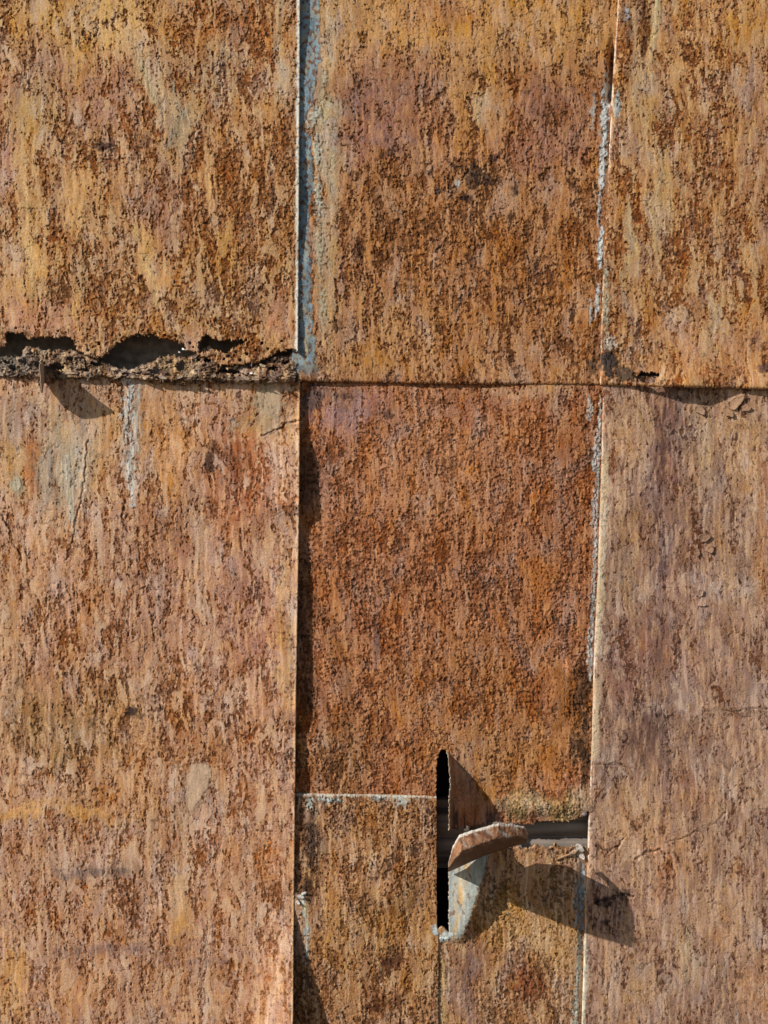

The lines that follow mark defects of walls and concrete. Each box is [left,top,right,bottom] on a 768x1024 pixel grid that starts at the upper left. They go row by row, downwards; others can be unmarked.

rust [91,139,115,152]
rust [456,153,500,203]
peeling [111,364,183,380]
rust [587,346,643,382]
rust [302,384,350,415]
water stain [119,378,142,507]
rust [204,440,218,472]
rust [573,666,592,783]
rust [302,809,317,893]
peeling [431,854,489,942]
rust [595,889,630,925]
rust [380,957,398,974]